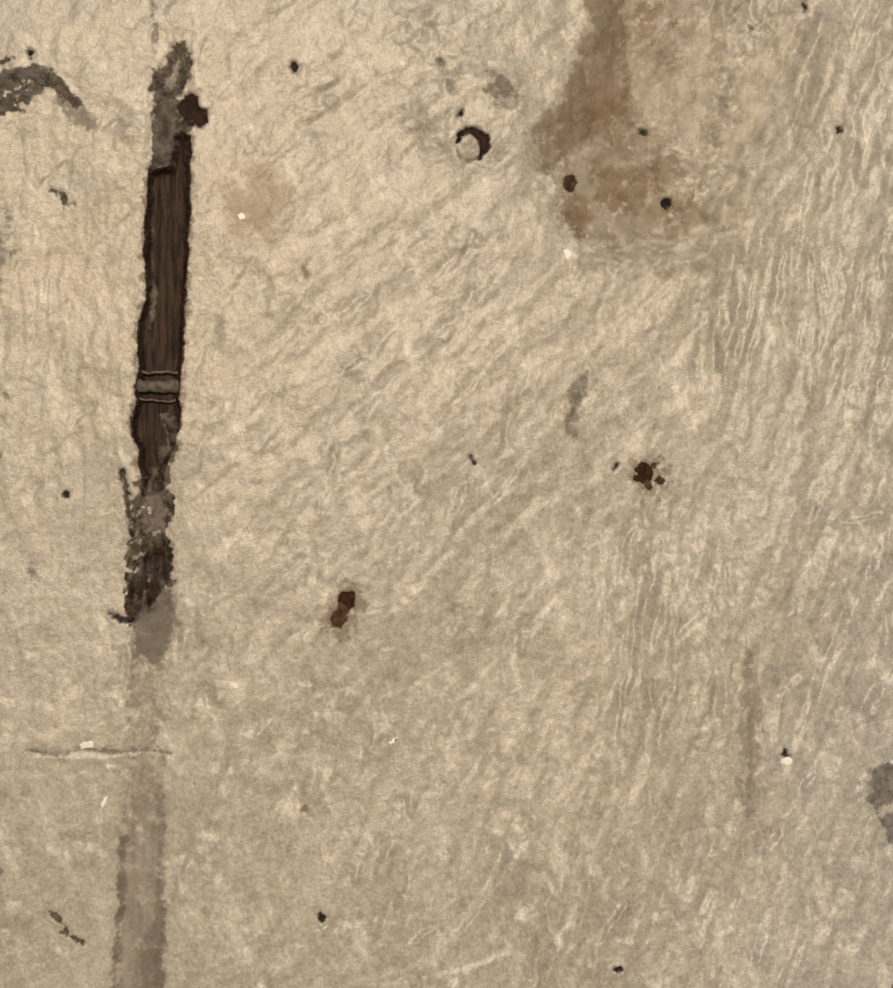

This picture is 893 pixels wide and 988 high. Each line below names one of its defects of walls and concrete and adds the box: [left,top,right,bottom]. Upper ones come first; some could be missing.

peeling [148,41,193,170]
rust [177,93,208,128]
peeling [867,760,893,843]